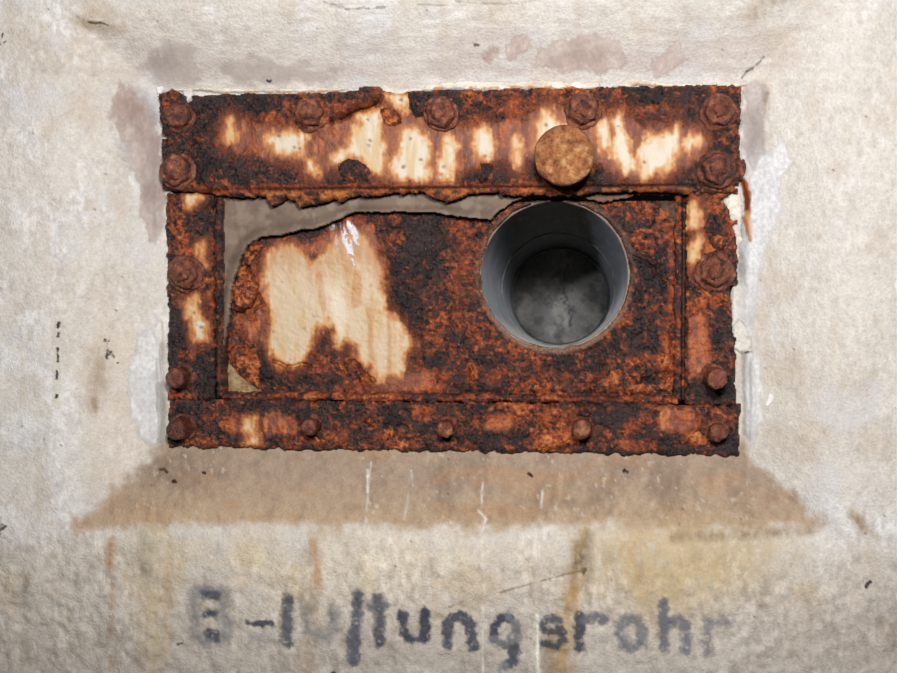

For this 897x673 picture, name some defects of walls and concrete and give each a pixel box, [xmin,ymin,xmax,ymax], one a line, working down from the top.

corrosion [159,89,180,125]
corrosion [380,90,430,126]
corrosion [337,158,372,182]
corrosion [479,163,496,184]
corrosion [631,231,657,257]
corrosion [704,209,730,251]
corrosion [231,241,263,312]
corrosion [228,344,261,387]
corrosion [579,324,675,395]
corrosion [537,429,571,450]
corrosion [689,431,709,443]